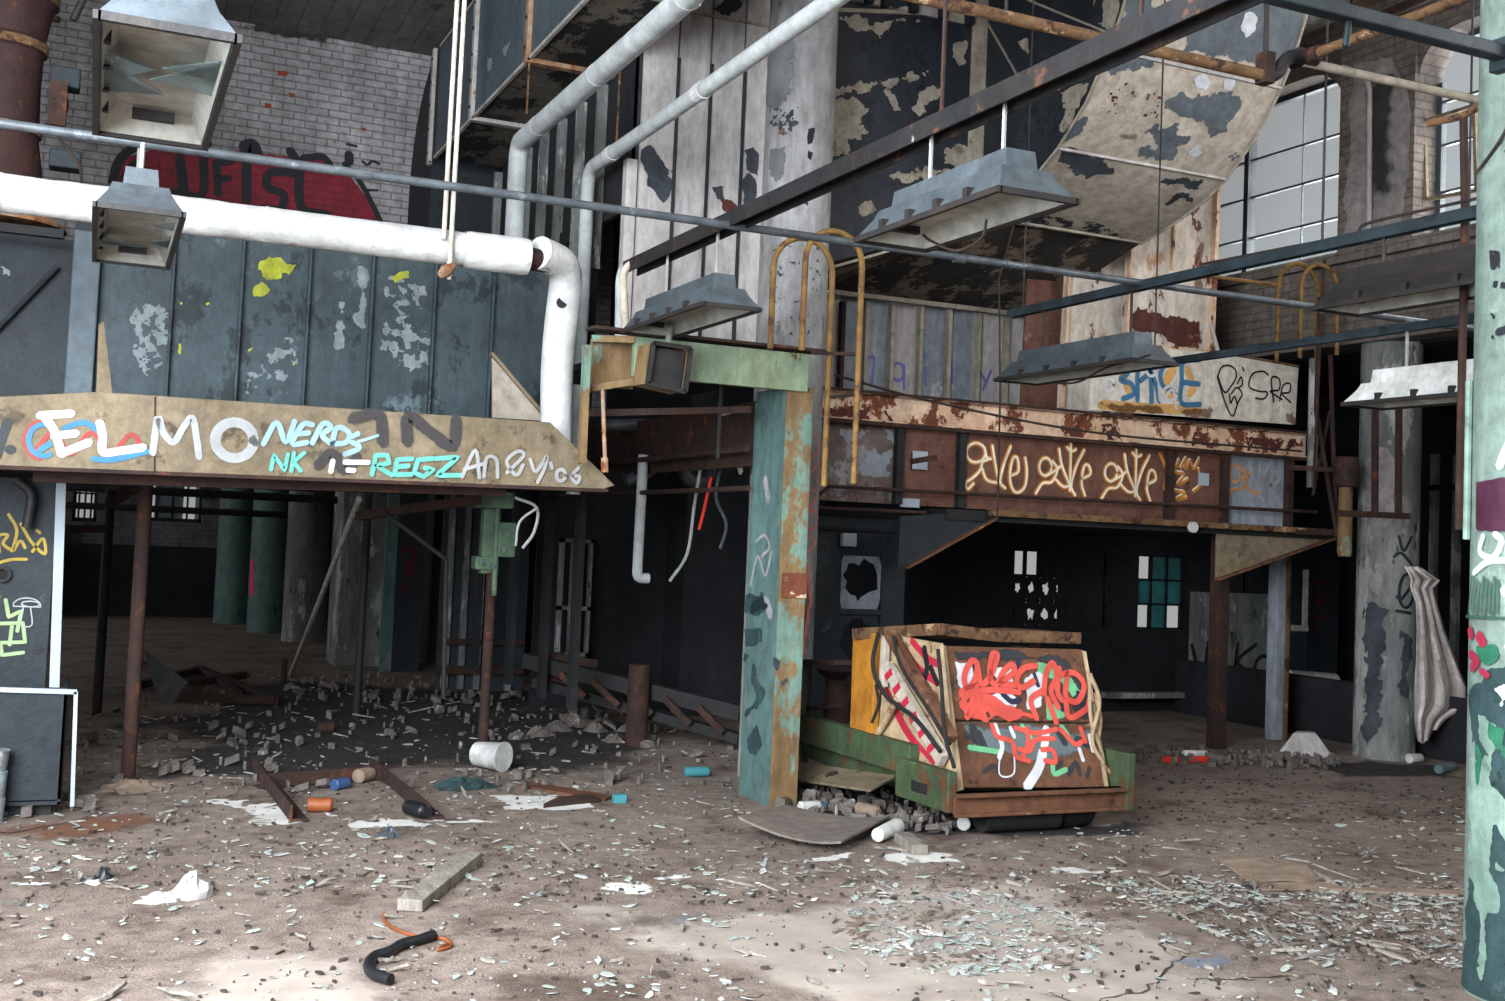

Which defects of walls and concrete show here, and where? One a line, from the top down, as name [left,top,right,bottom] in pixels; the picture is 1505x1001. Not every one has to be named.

peeling [839,0,920,38]
peeling [1183,3,1304,63]
peeling [640,145,673,203]
peeling [742,147,759,204]
peeling [1058,83,1115,179]
peeling [1138,91,1242,206]
peeling [1489,250,1505,289]
corrosion [822,405,893,429]
corrosion [1100,402,1163,441]
corrosion [1183,407,1213,448]
corrosion [1245,413,1303,455]
peeling [743,592,788,756]